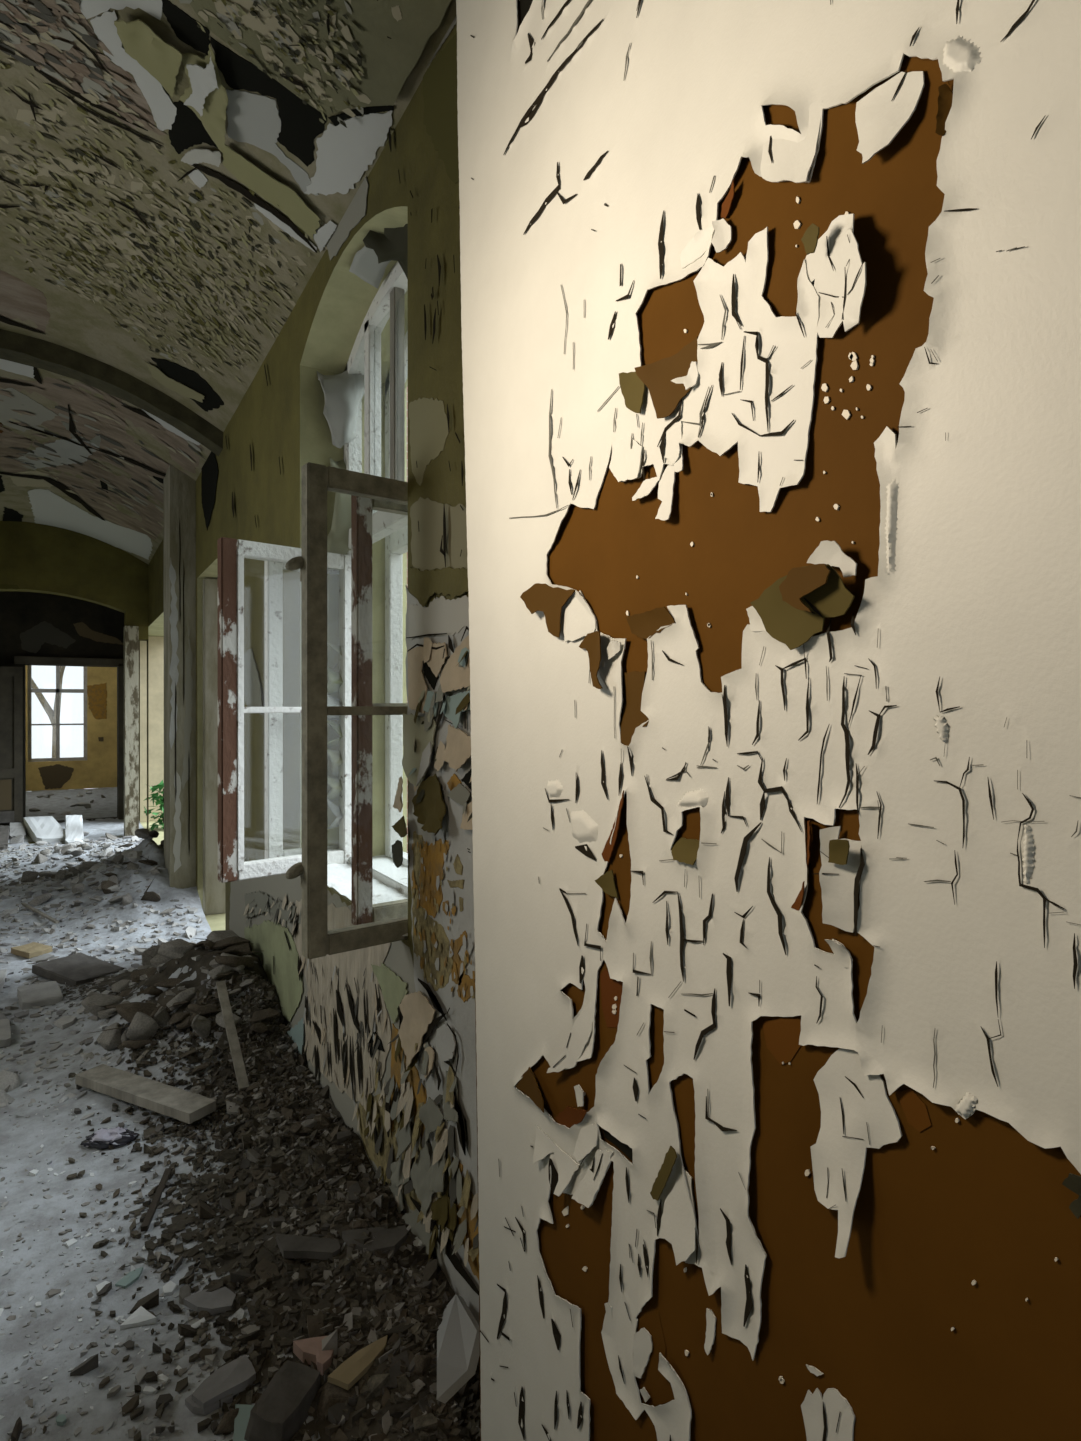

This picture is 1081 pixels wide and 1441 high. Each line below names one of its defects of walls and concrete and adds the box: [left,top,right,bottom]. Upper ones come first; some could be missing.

spalling [0,0,408,412]
crack [523,151,608,235]
crack [503,0,641,155]
crack [766,136,774,163]
peeling [760,101,866,338]
peeling [855,71,953,164]
crack [891,28,919,101]
crack [1000,0,1035,42]
peeling [609,329,699,521]
spalling [229,567,479,1325]
crack [538,598,1081,1131]
peeling [805,1048,902,1258]